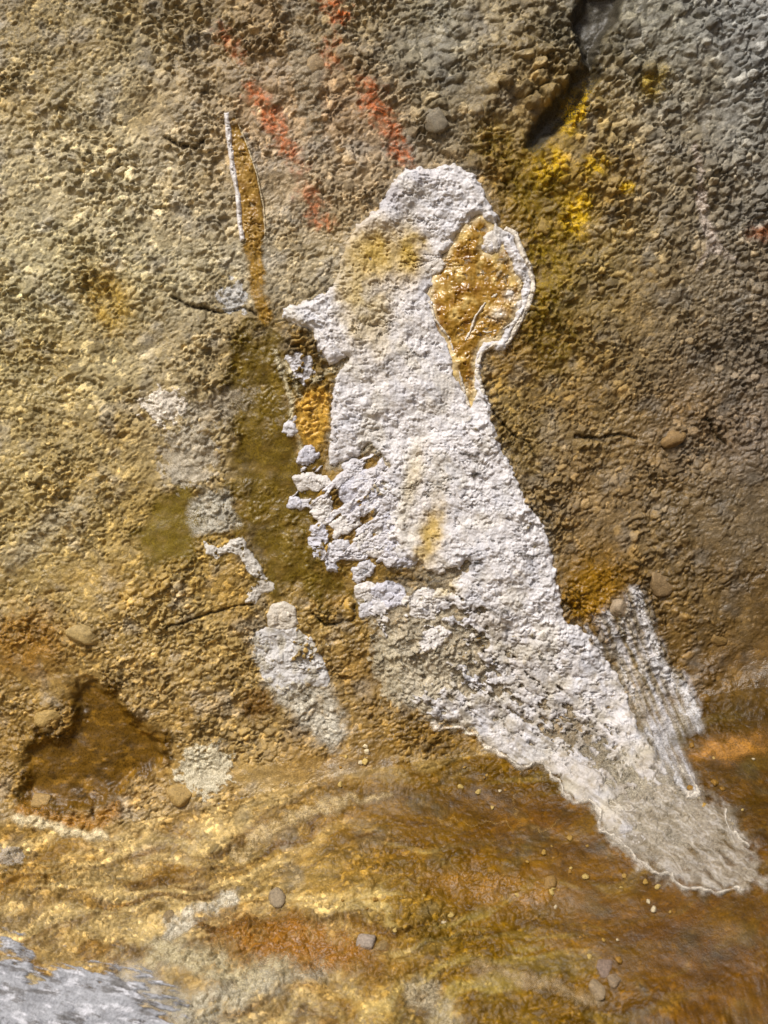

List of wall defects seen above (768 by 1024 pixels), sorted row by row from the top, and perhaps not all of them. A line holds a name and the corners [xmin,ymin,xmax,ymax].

leakage [281,6,328,143]
leakage [562,93,588,133]
crack [172,298,257,316]
leakage [132,145,766,894]
leakage [0,844,25,866]
leakage [0,891,326,1024]
leakage [405,979,452,1024]